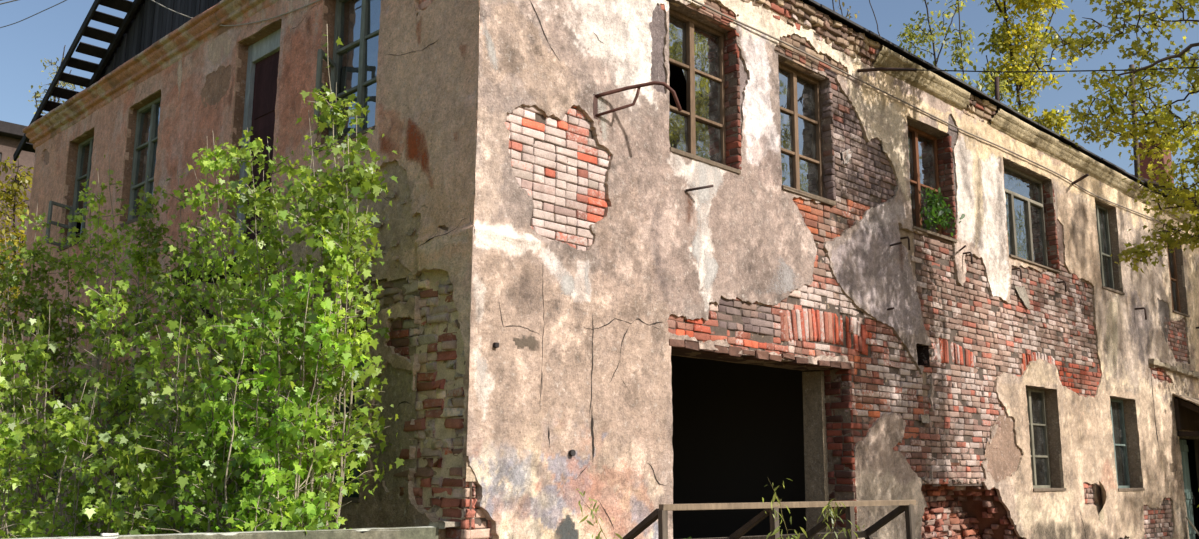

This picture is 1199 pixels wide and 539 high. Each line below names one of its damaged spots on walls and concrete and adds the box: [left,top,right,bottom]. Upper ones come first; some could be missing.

flaking render [505,105,611,251]
flaking render [267,161,493,539]
crack [575,318,662,481]
flaking render [649,0,1101,539]
flaking render [1150,298,1189,383]
flaking render [1083,481,1107,526]
flaking render [1143,498,1173,539]